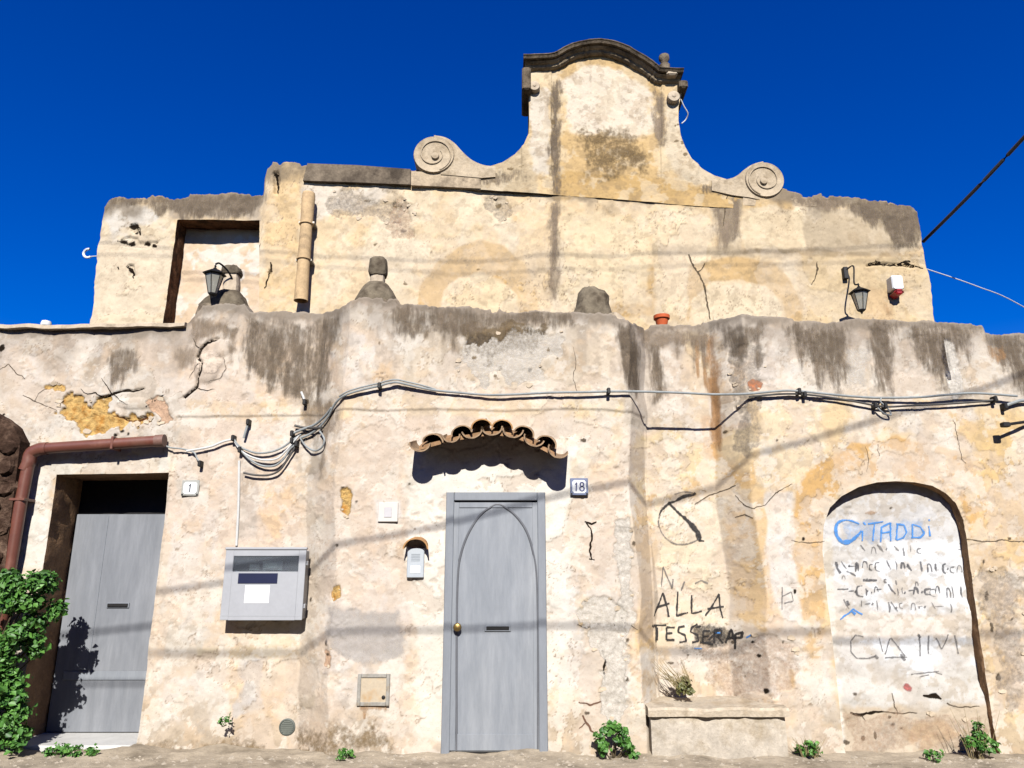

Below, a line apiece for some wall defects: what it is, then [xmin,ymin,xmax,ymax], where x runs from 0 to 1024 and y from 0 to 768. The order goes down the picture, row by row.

leakage [548,82,562,297]
crack [688,254,711,319]
spalling [44,382,173,438]
crack [81,340,217,422]
leakage [192,318,338,440]
leakage [393,306,573,367]
leakage [618,325,711,403]
leakage [788,321,894,390]
leakage [913,326,970,401]
spalling [340,487,358,519]
crack [585,521,596,560]
flaking render [576,517,637,722]